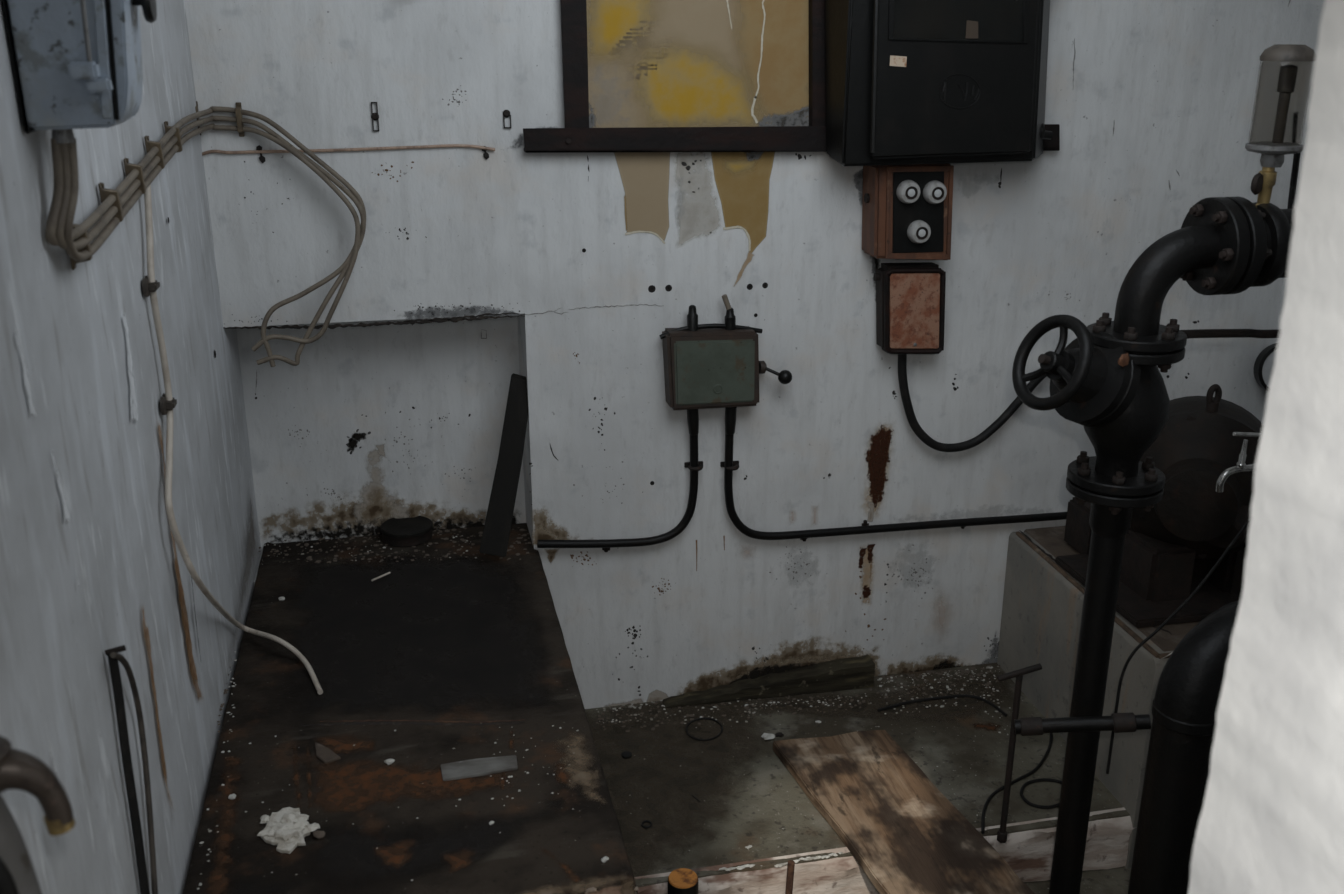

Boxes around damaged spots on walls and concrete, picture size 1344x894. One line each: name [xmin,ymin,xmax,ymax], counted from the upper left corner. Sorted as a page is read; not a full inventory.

peeling [614,152,775,290]
crack [223,303,664,330]
water stain [241,407,486,605]
rust [866,425,894,522]
rust [142,608,169,794]
rust [171,531,202,698]
water stain [605,635,999,707]
rust [855,544,886,649]